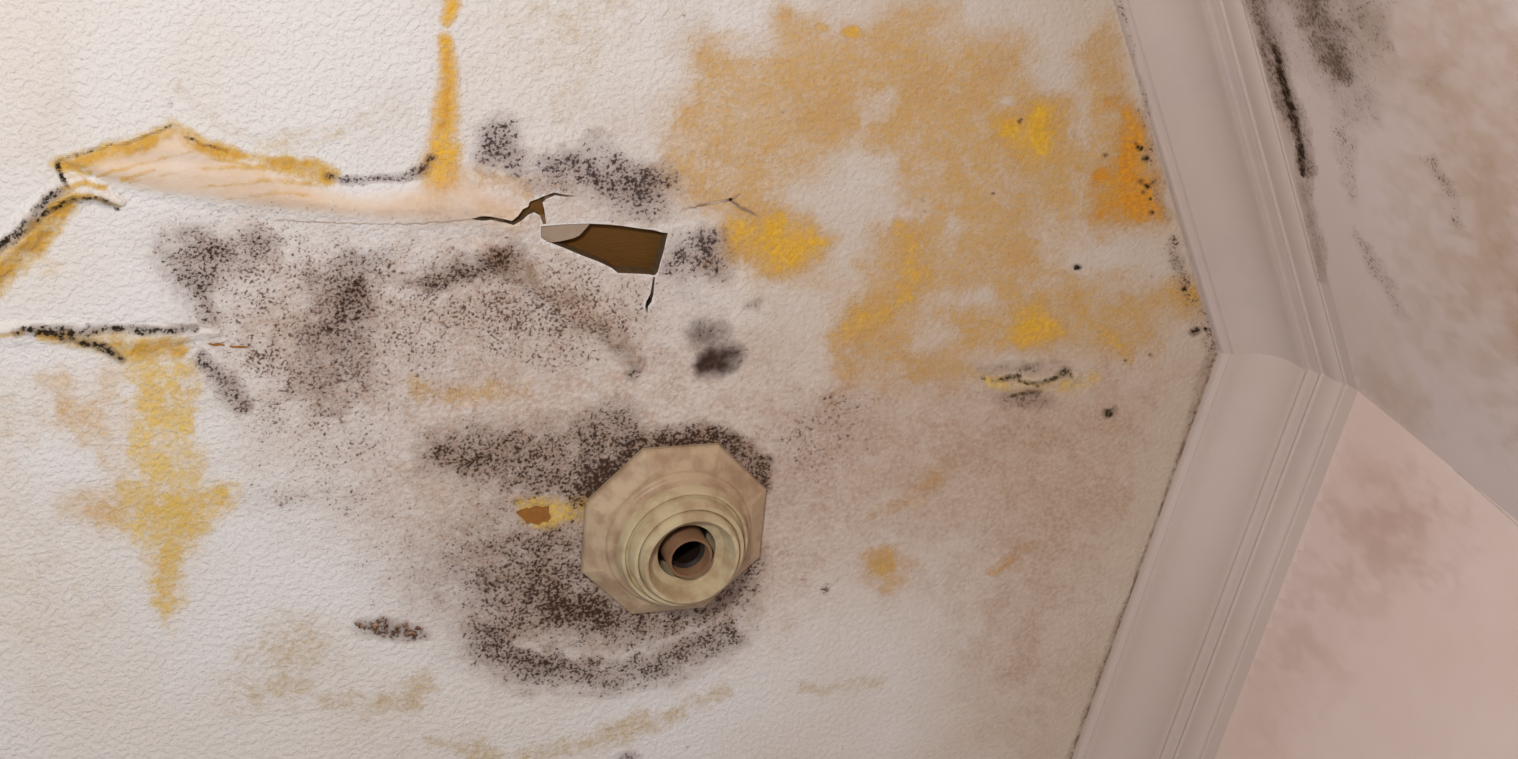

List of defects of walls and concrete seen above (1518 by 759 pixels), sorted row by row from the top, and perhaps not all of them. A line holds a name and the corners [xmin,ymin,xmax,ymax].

damp [1245,0,1389,197]
crack [208,341,249,349]
spalling [541,224,668,275]
damp [0,8,1216,699]